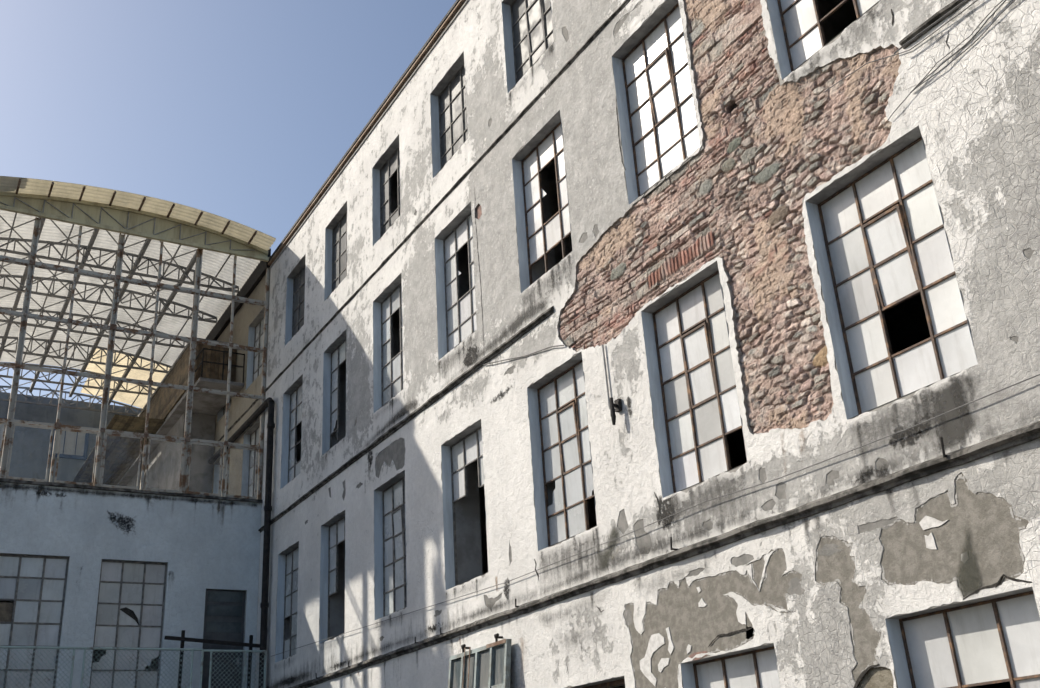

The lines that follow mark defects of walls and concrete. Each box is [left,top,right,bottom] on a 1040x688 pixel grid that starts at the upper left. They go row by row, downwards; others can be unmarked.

crack [901,31,1040,299]
flaking render [557,0,901,435]
damp [889,376,974,449]
peeling [375,437,406,478]
damp [855,466,889,484]
peeling [617,509,652,554]
damp [541,495,743,583]
peeling [623,548,805,688]
peeling [815,470,1029,688]